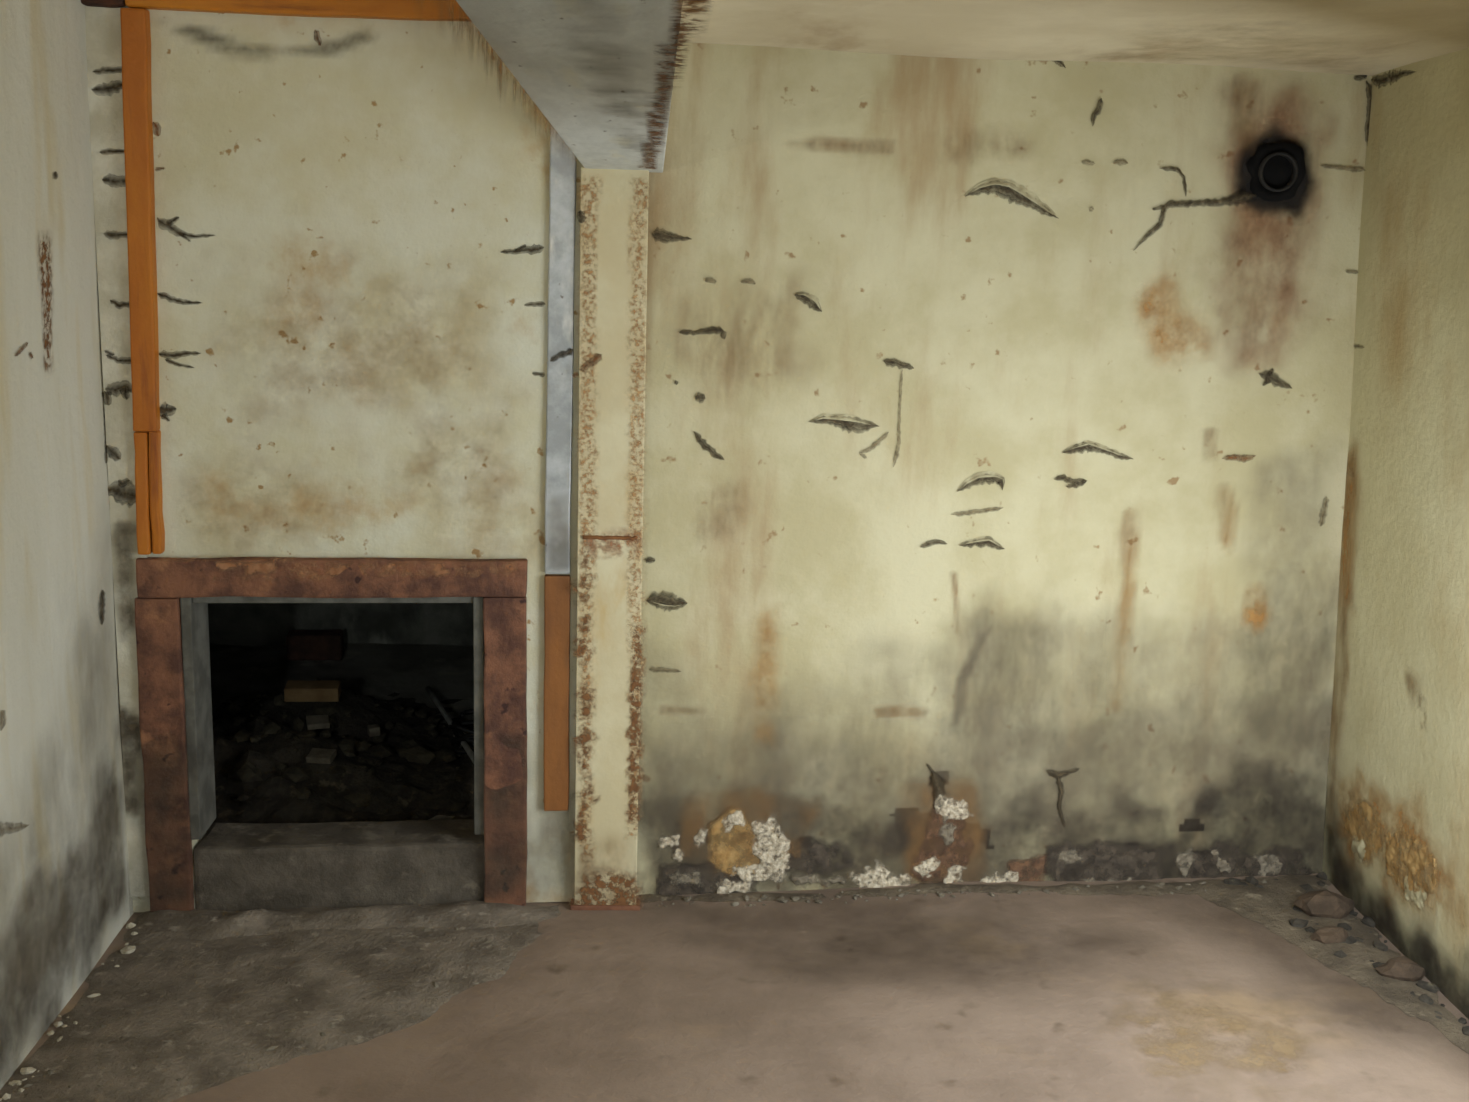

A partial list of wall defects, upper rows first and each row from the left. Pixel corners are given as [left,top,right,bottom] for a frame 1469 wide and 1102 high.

crack [1088,161,1256,248]
corrosion [570,0,709,856]
leakage [116,525,134,629]
leakage [651,765,823,884]
leakage [833,740,1189,888]
leakage [0,710,141,1069]
corrosion [574,872,641,906]